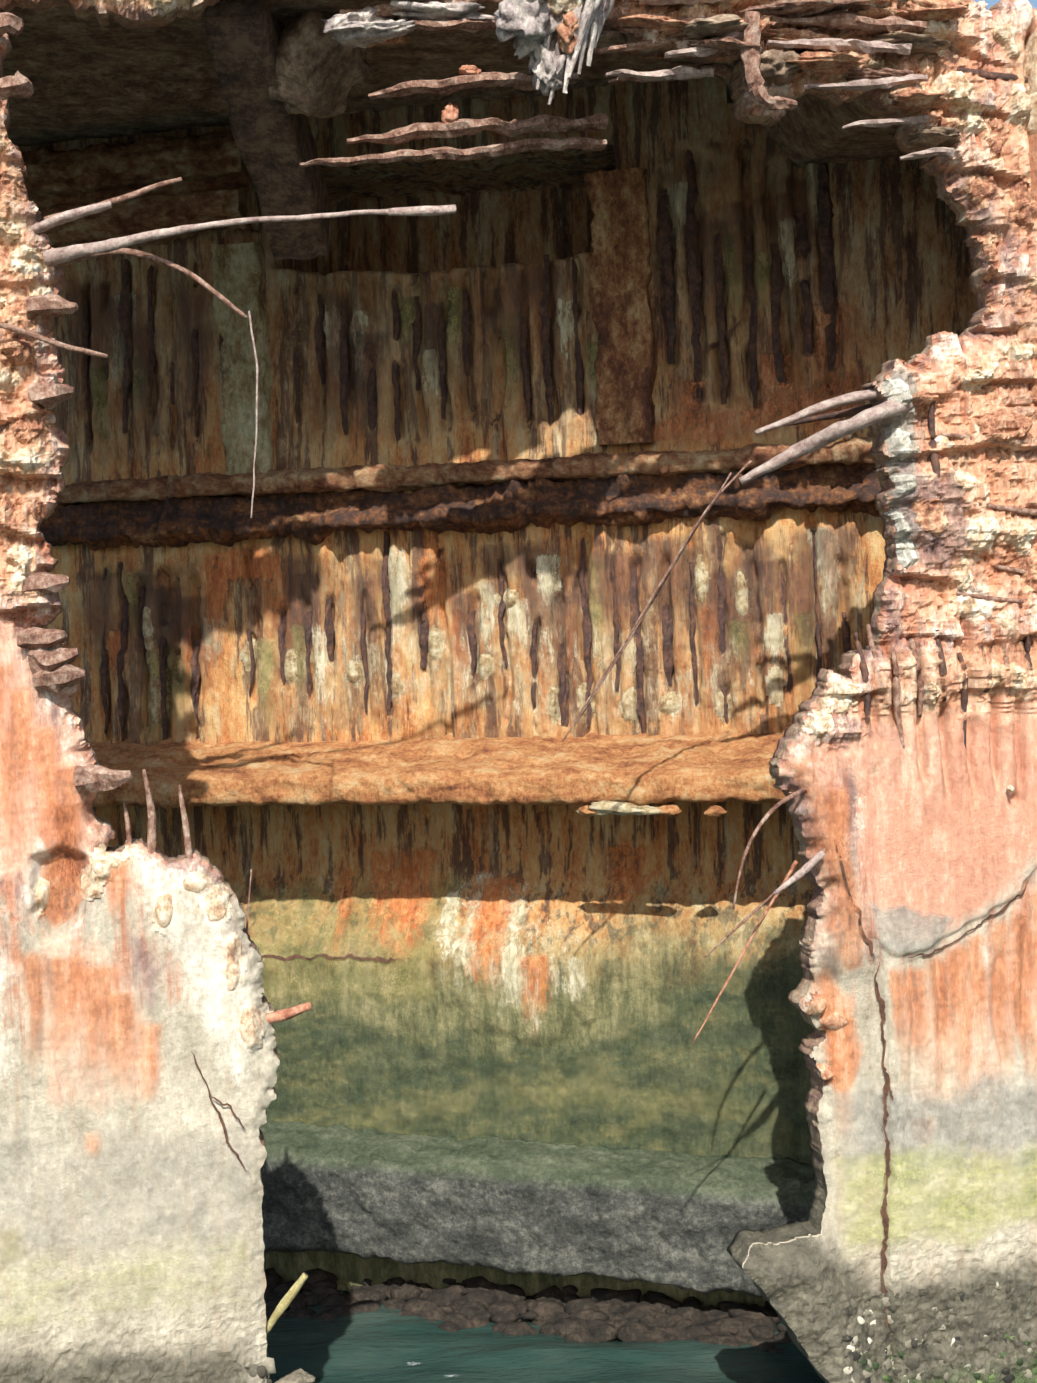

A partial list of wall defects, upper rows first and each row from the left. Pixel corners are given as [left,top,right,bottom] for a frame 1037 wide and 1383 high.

spalling [655,149,837,409]
spalling [593,0,1037,337]
spalling [0,0,471,1079]
corrosion [0,639,77,874]
corrosion [23,952,155,1081]
crack [191,1052,251,1175]
water stain [438,874,585,1026]
flaking render [240,331,1037,1383]
corrosion [793,762,860,1094]
crack [834,840,1031,1327]
corrosion [890,894,1037,1042]
water stain [743,1235,1037,1383]